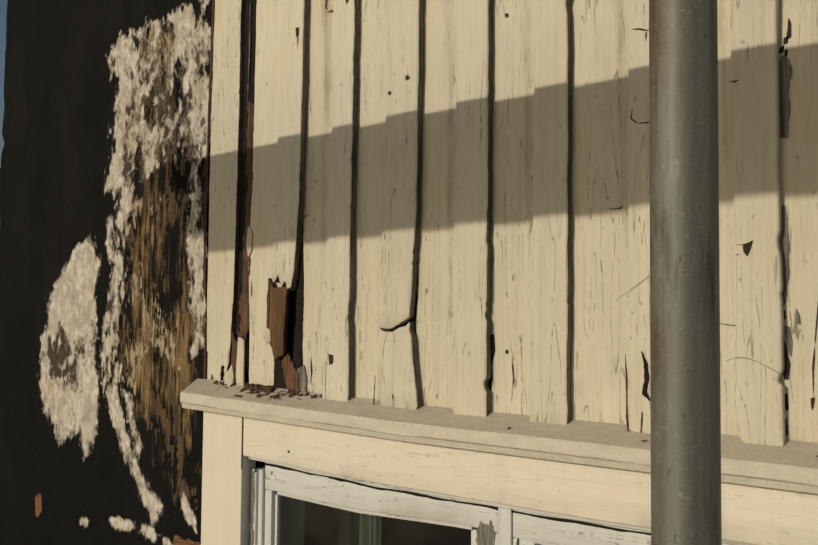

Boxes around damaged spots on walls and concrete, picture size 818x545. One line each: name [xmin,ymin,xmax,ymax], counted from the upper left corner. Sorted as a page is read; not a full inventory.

water stain [122,23,208,183]
peeling [779,18,794,139]
crack [380,249,419,337]
water stain [47,321,93,392]
peeling [224,337,245,386]
peeling [263,327,271,344]
peeling [641,350,650,402]
peeling [476,520,495,545]